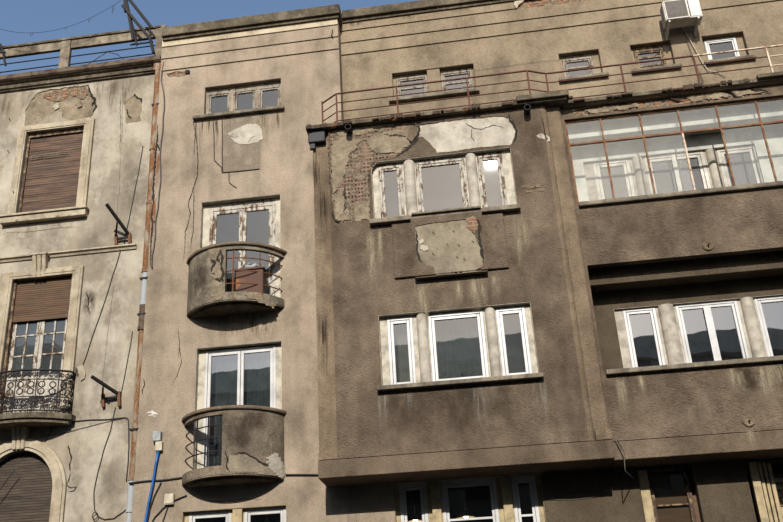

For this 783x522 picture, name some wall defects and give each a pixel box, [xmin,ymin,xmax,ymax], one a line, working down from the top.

flaking render [514,0,586,9]
peeling [25,85,97,126]
peeling [124,94,142,124]
flaking render [567,78,771,116]
peeling [306,101,524,224]
crack [183,124,198,259]
peeling [415,216,484,275]
peeling [208,247,225,300]